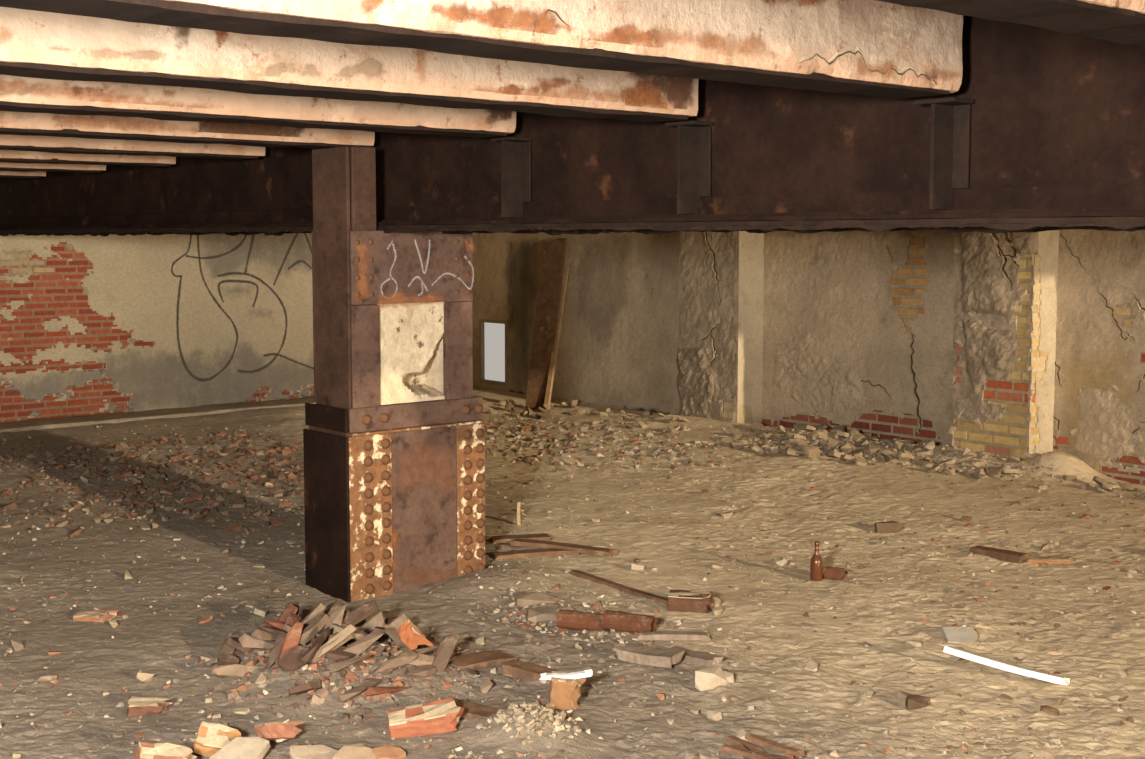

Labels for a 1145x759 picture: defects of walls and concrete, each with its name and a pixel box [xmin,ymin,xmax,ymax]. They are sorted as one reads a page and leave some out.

corrosion [362,0,382,12]
corrosion [433,5,570,34]
corrosion [597,25,676,47]
crack [799,47,937,85]
corrosion [1,81,200,108]
corrosion [477,72,693,109]
corrosion [488,109,512,122]
corrosion [357,245,438,305]
crack [1060,233,1145,345]
flaking render [0,242,155,423]
flaking render [762,231,1071,459]
flaking render [1082,454,1145,485]